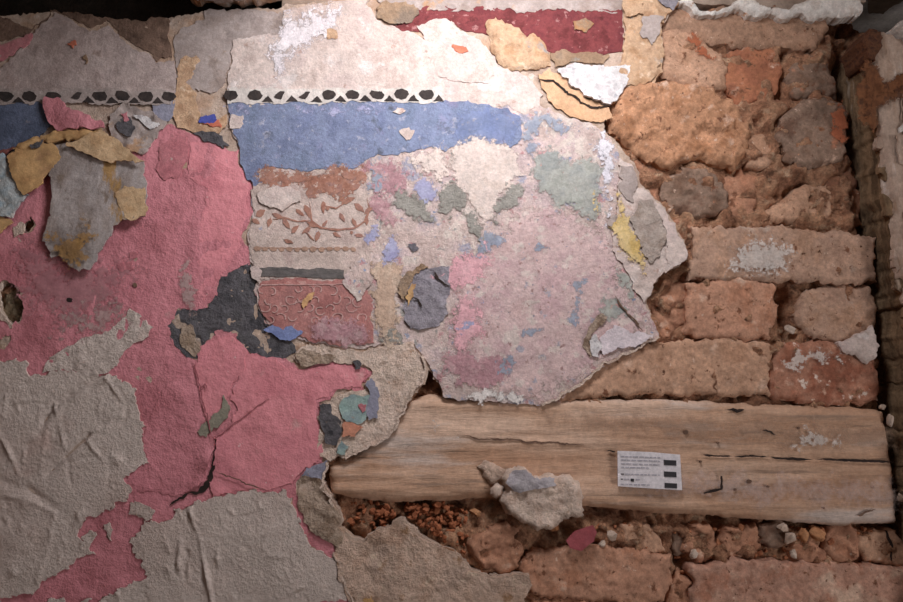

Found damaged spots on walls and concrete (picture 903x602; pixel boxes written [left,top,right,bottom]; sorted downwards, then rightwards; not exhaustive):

spalling [676,0,903,26]
spalling [607,158,688,303]
efflorescence [724,235,797,277]
peeling [0,0,631,602]
spalling [582,313,653,358]
efflorescence [785,347,844,372]
crack [169,359,268,506]